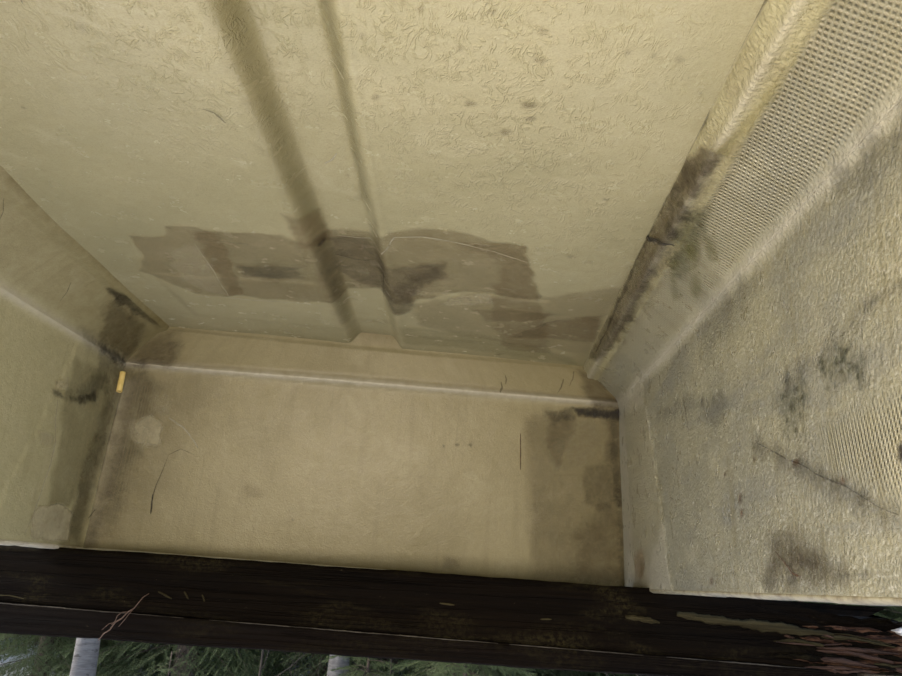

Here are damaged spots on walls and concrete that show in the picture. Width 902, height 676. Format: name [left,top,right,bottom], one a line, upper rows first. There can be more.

water stain [591,150,718,358]
water stain [575,397,620,419]